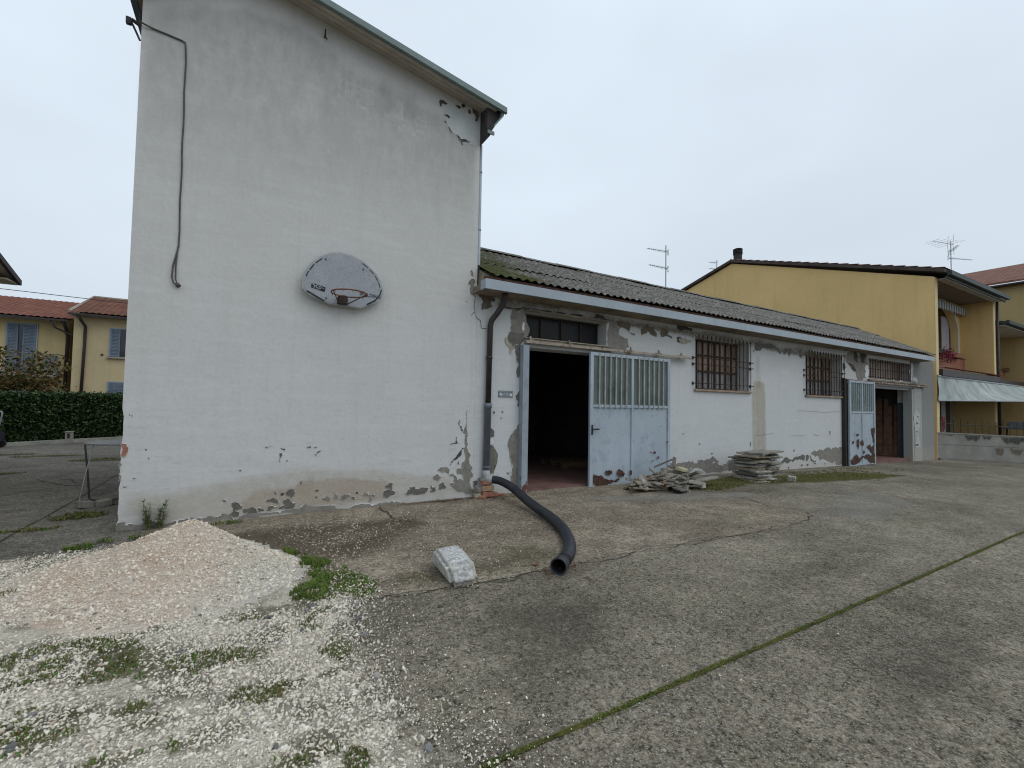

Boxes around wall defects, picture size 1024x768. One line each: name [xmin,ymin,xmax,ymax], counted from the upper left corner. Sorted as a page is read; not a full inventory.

peeling [439,99,480,147]
flaking render [468,270,692,378]
rust [593,469,632,486]
flaking render [670,453,736,473]
flaking render [781,447,842,468]
rust [851,427,875,465]
flaking render [116,411,555,620]